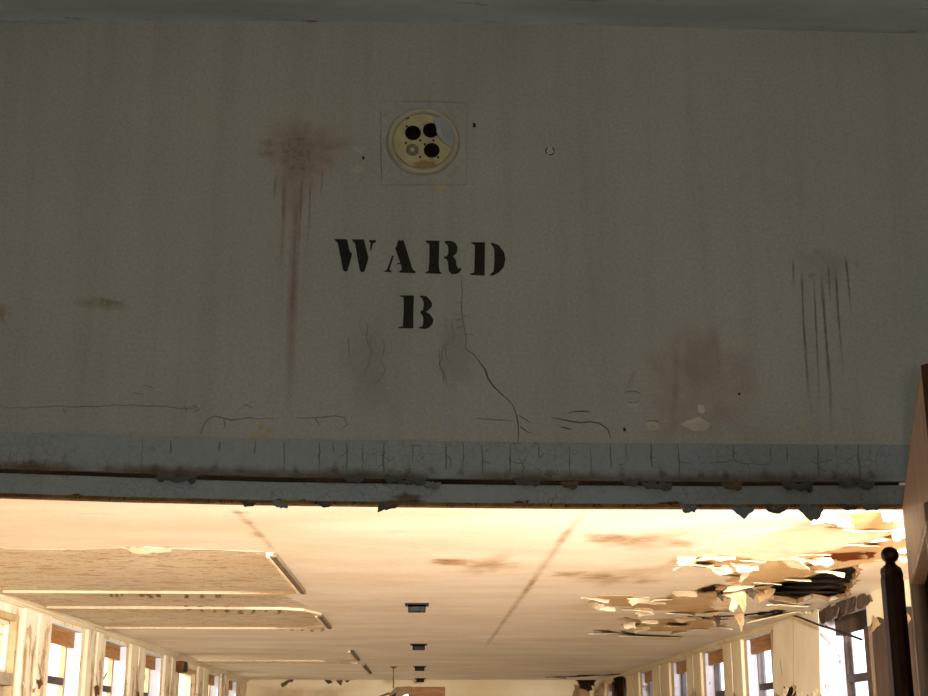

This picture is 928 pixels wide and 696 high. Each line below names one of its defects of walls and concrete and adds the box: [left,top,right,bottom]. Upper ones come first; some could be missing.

leakage [802,280,840,380]
crack [445,276,544,474]
crack [304,415,414,474]
crack [552,411,627,475]
crack [650,444,788,479]
peeling [377,502,398,512]
peeling [581,478,907,635]
peeling [22,637,47,696]